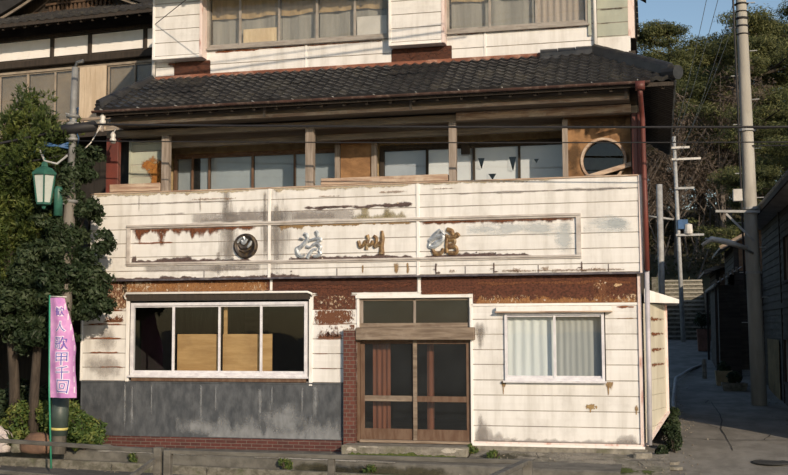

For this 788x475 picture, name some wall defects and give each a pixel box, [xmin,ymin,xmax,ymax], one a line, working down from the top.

rust [134,226,253,244]
rust [122,267,637,339]
rust [89,309,123,325]